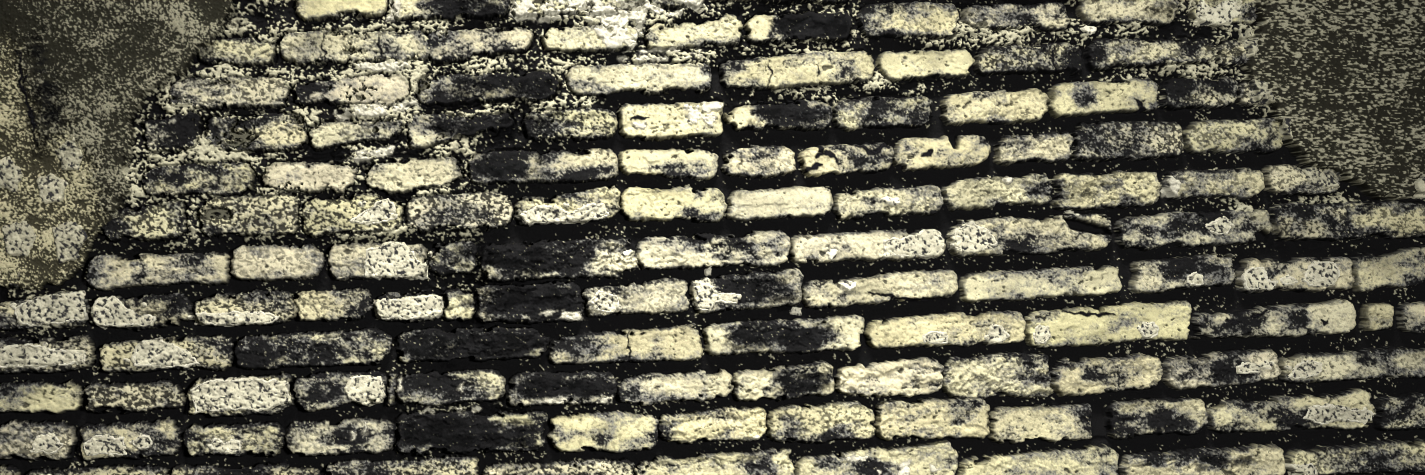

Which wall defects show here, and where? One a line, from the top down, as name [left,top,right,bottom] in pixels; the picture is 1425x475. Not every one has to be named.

spalling [1193,0,1259,58]
spalling [520,202,610,227]
spalling [880,221,998,260]
spalling [0,290,200,370]
spalling [187,311,280,327]
spalling [364,241,444,321]
spalling [588,290,622,313]
spalling [692,266,742,312]
spalling [1237,260,1340,291]
spalling [190,375,291,414]
spalling [344,375,387,407]
spalling [83,433,153,457]